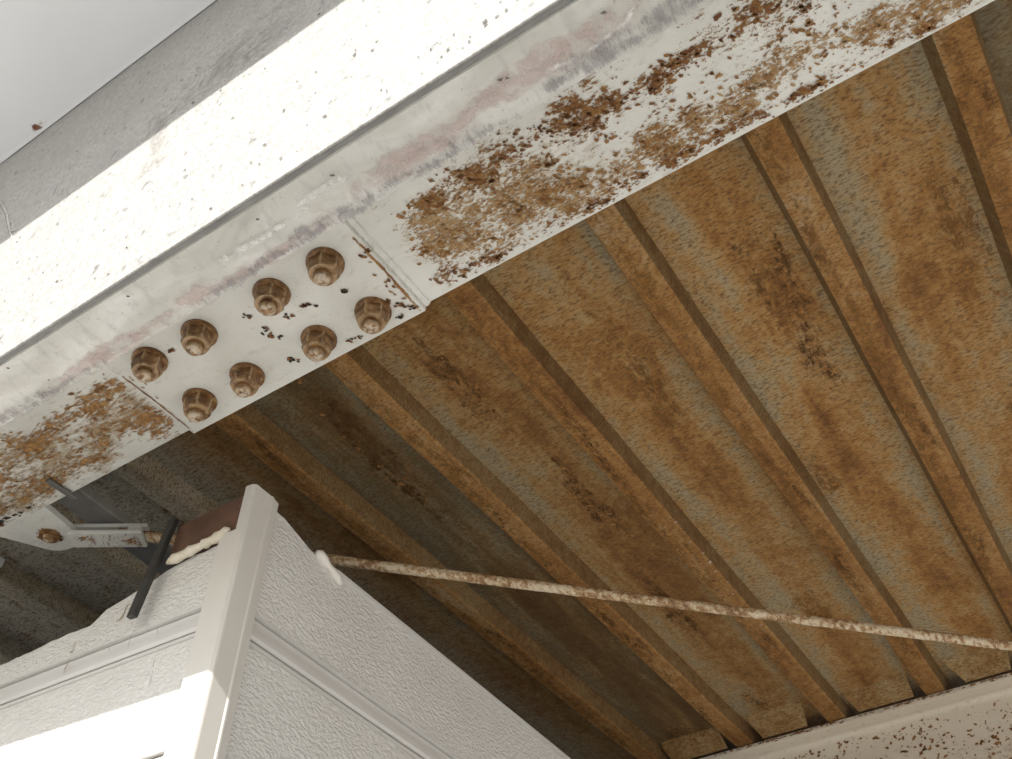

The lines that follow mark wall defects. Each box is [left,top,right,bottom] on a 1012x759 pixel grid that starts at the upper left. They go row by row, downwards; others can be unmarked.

rust [384,0,983,287]
rust [0,373,190,517]
rust [741,425,918,658]
rust [714,672,1012,759]